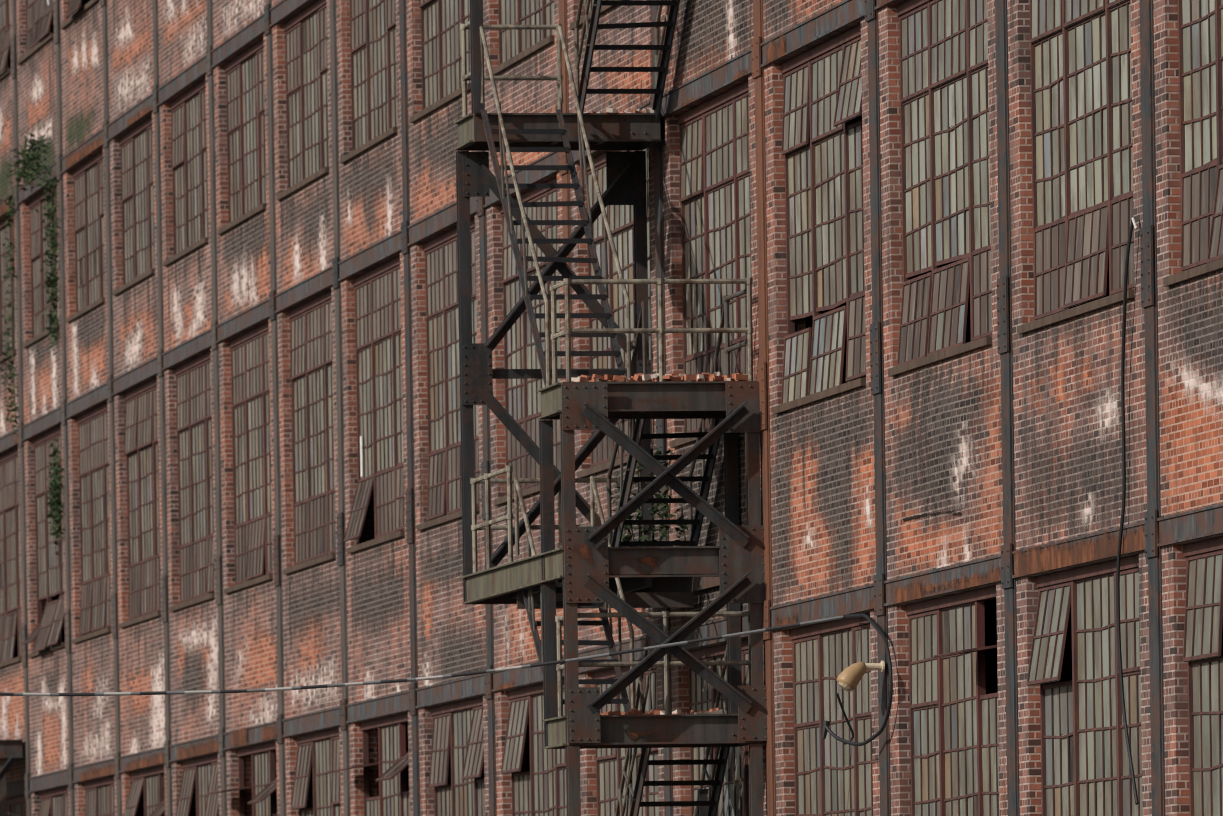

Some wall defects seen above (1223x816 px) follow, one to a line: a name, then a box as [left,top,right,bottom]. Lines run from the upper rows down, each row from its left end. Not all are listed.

damp [66,9,99,73]
damp [113,2,140,44]
damp [165,0,202,62]
damp [223,0,264,32]
efflorescence [114,57,150,108]
damp [27,118,52,149]
efflorescence [1175,367,1223,406]
damp [0,690,21,739]
damp [42,651,68,769]
damp [84,682,111,763]
damp [129,618,166,754]
damp [176,600,219,725]